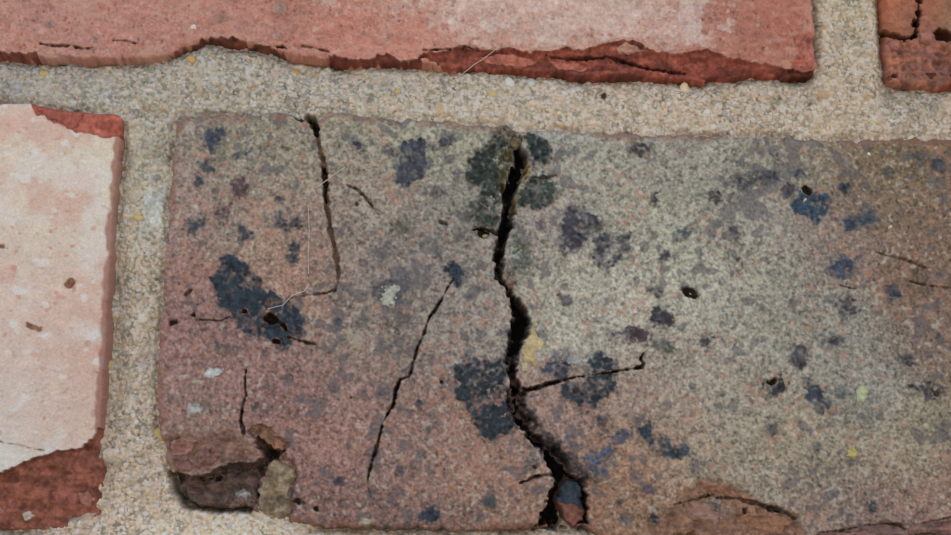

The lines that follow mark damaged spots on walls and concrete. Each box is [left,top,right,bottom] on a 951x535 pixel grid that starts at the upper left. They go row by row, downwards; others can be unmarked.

spalling [0,51,43,66]
spalling [168,36,287,60]
spalling [328,29,817,88]
spalling [879,0,951,93]
crack [290,117,380,299]
crack [198,315,231,323]
crack [286,335,317,345]
crack [472,135,645,528]
crack [367,278,455,498]
spalling [0,427,107,530]
spalling [160,418,290,511]
spalling [637,474,951,535]